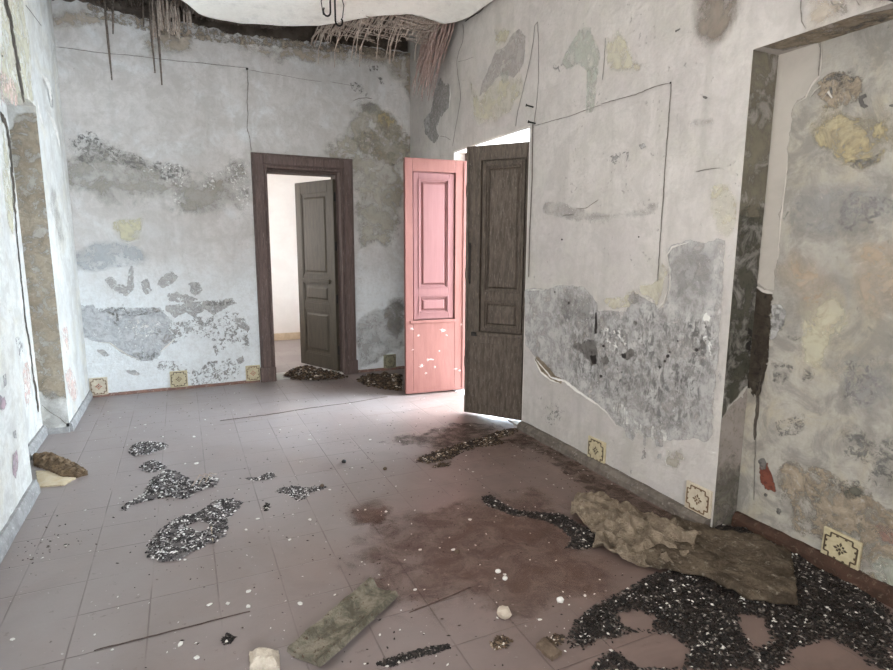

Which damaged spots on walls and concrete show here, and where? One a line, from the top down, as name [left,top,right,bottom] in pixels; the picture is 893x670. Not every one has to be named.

damp [697,0,736,40]
damp [329,82,410,246]
peeling [424,79,451,143]
crack [515,22,671,300]
peeling [810,72,888,169]
crack [0,111,39,412]
damp [524,9,893,442]
peeling [81,268,249,385]
flaking render [533,356,562,384]
flaking render [573,312,609,378]
rust [758,458,776,497]
damp [829,434,893,491]